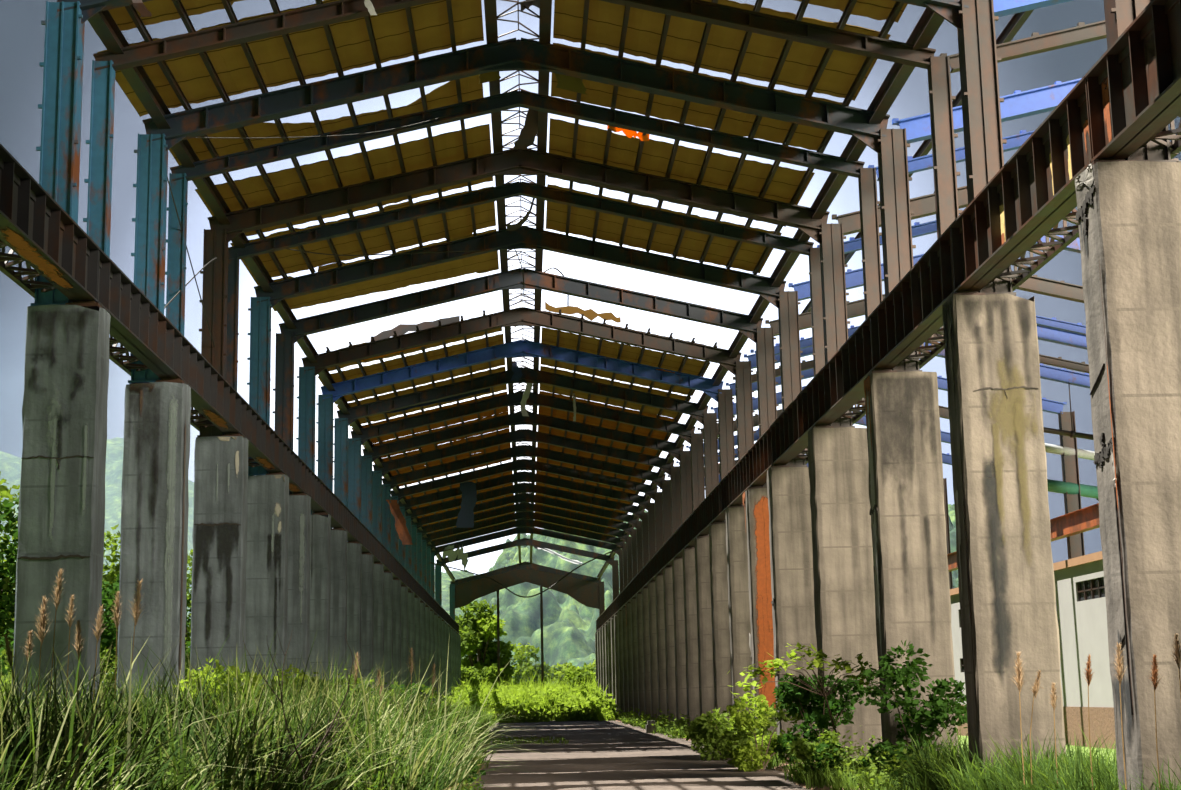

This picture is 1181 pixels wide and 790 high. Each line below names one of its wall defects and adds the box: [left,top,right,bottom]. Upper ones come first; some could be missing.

rust [1102,71,1123,142]
spalling [1075,164,1094,190]